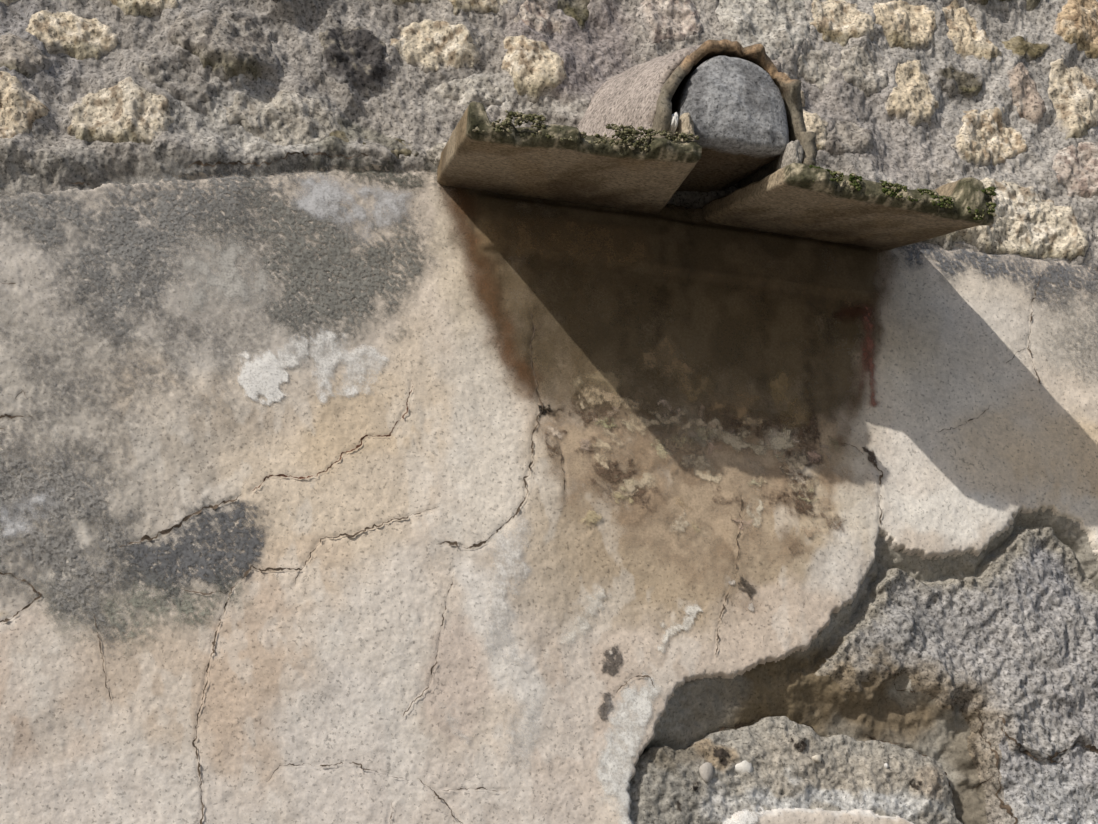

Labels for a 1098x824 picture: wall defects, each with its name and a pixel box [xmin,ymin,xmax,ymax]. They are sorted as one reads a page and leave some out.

crack [0,392,31,429]
crack [120,386,413,547]
damp [0,148,884,643]
crack [440,307,568,549]
crack [0,572,42,622]
crack [182,509,431,824]
crack [401,582,453,720]
damp [485,520,530,662]
damp [658,605,702,652]
crack [715,494,743,654]
spalling [628,507,1098,824]
crack [269,762,495,823]